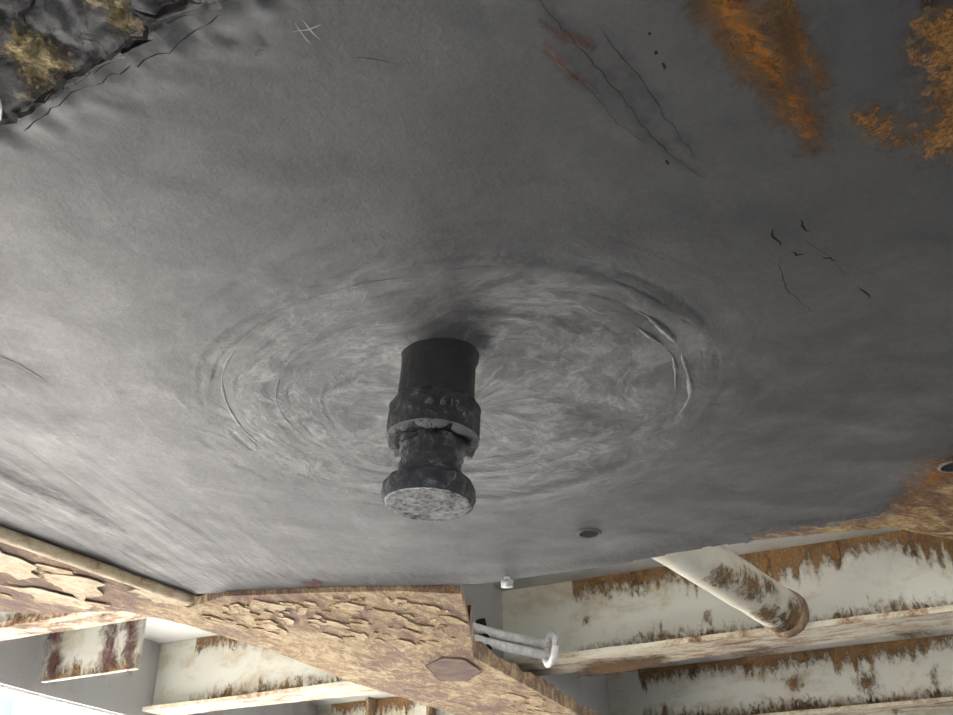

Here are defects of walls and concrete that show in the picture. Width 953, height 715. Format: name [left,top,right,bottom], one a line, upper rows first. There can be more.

crack [0,0,225,131]
rust [850,4,953,163]
peeling [0,550,111,609]
peeling [128,589,189,606]
peeling [201,597,468,646]
rust [572,530,953,651]
peeling [426,658,481,681]
rust [580,632,953,715]
peeling [500,693,560,715]